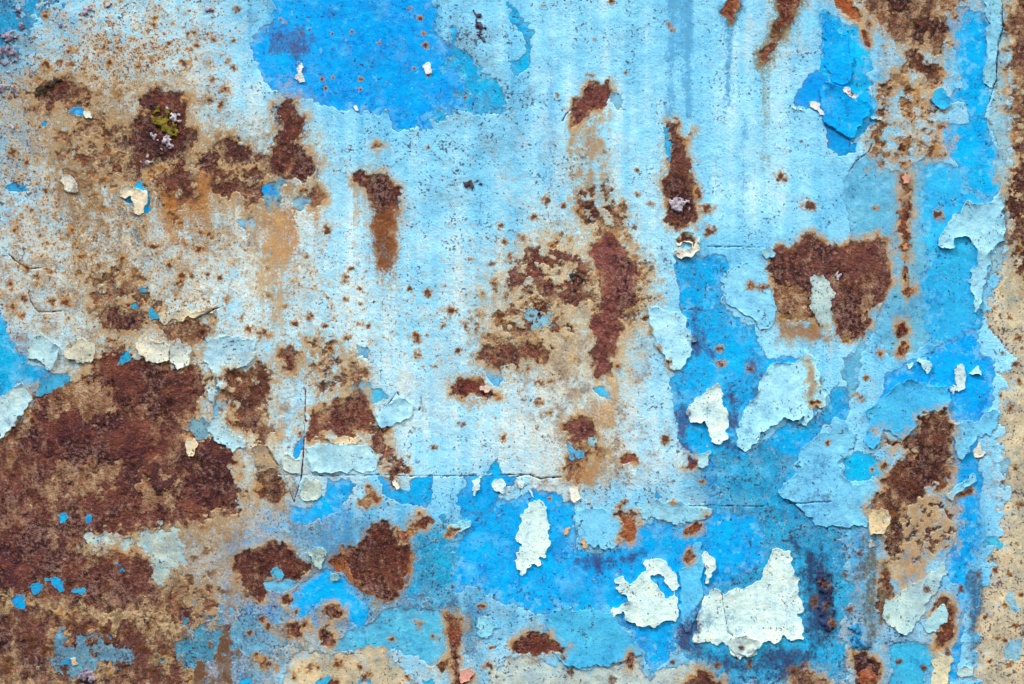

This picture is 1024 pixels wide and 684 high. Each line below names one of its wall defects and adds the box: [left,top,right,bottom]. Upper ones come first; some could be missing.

corrosion [0,29,434,684]
corrosion [441,71,717,500]
peeling [250,0,1024,684]
corrosion [746,0,969,408]
corrosion [862,406,975,671]